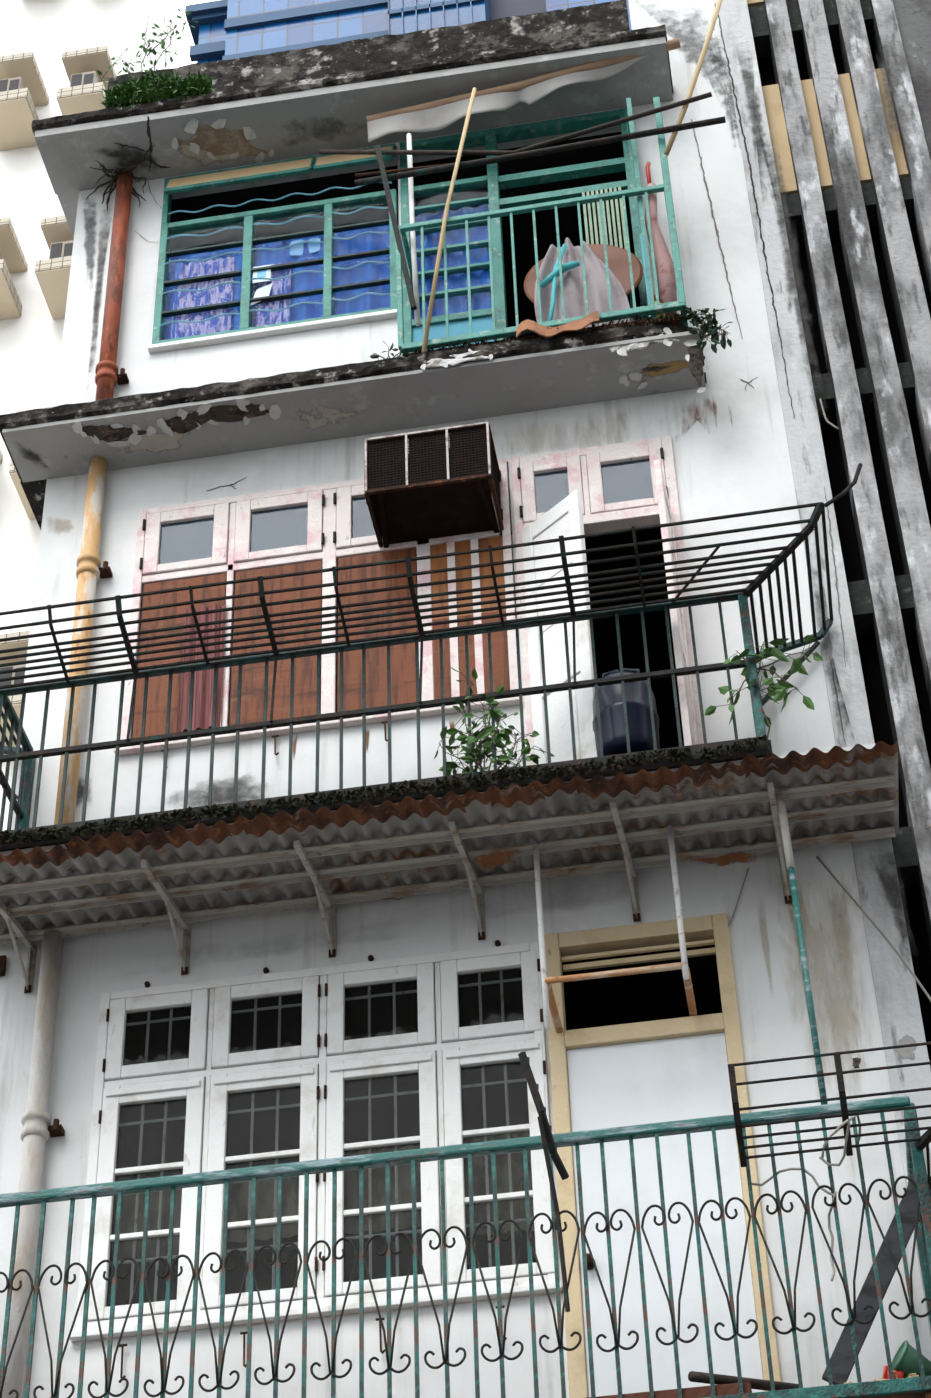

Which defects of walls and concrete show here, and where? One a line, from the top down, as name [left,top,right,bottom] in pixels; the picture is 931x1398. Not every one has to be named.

spalling [171,118,274,166]
water stain [661,18,818,377]
water stain [84,204,109,366]
spalling [609,327,710,393]
spalling [72,398,282,453]
water stain [188,779,258,806]